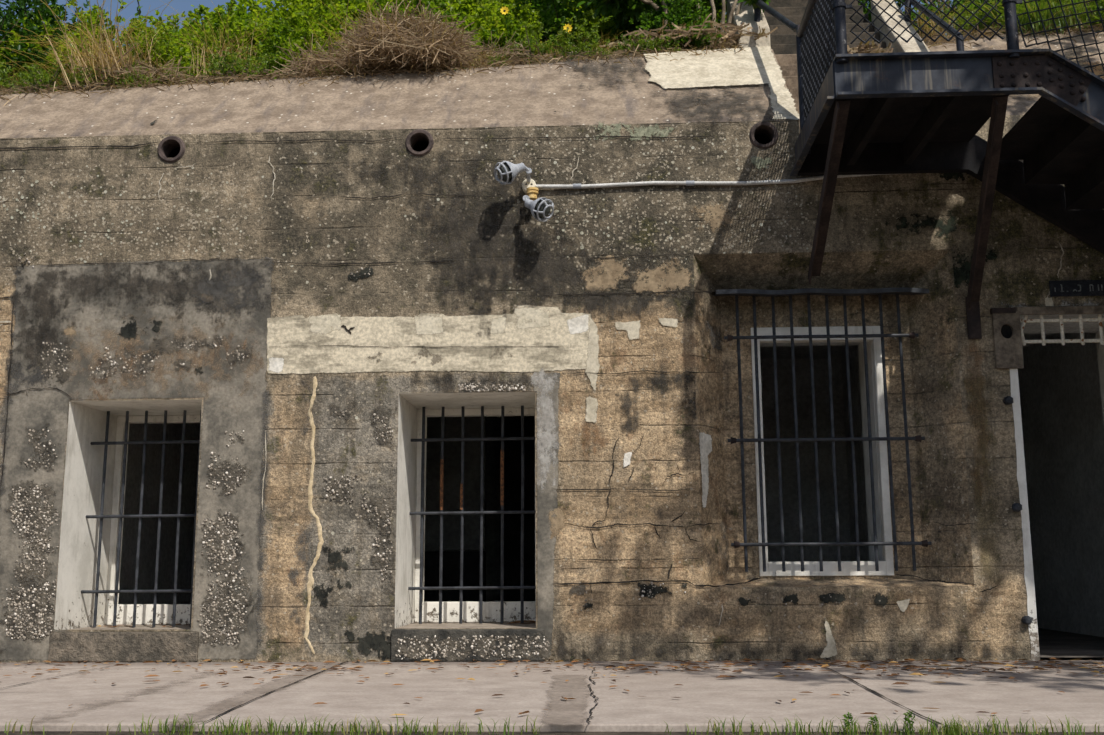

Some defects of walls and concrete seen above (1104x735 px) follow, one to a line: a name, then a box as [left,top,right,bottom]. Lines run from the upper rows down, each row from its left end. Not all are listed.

crack [0,141,156,149]
crack [158,137,400,201]
crack [23,258,456,266]
water stain [348,153,691,320]
peeling [582,255,691,295]
water stain [8,257,276,390]
crack [323,325,462,348]
crack [0,297,70,488]
crack [260,433,268,510]
crack [304,376,324,654]
crack [554,435,763,594]